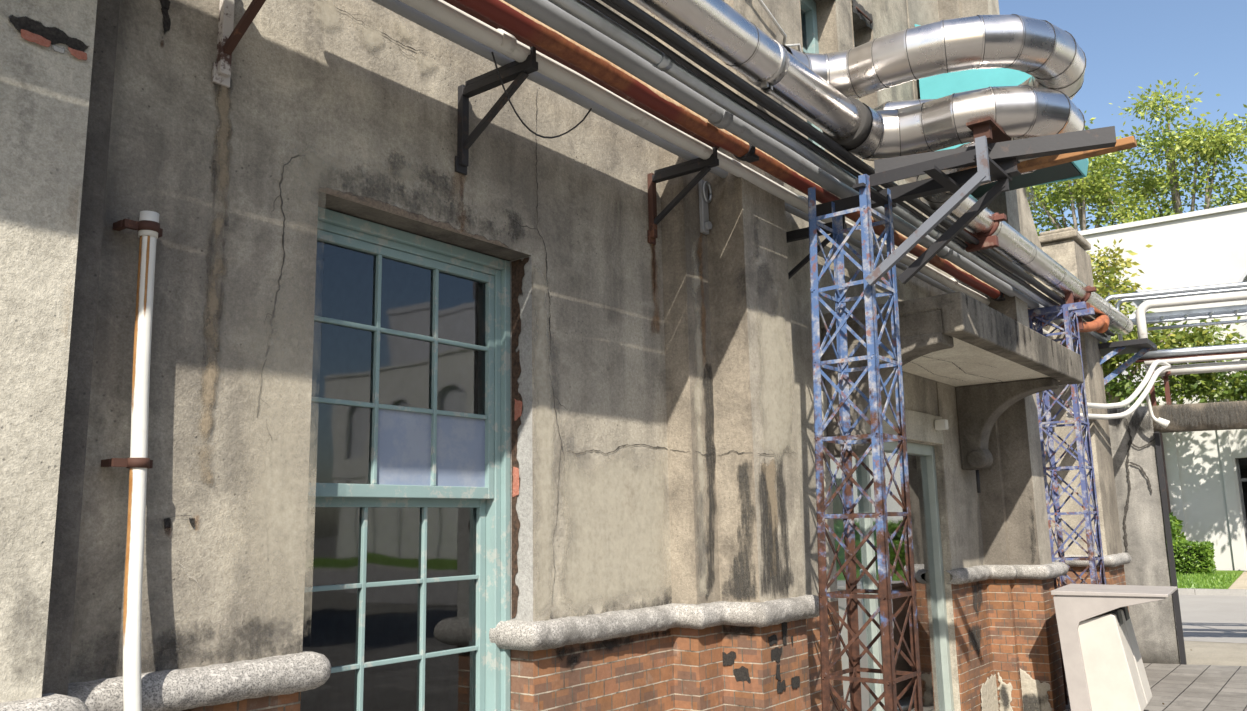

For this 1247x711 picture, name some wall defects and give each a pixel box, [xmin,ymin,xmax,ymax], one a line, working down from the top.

flaking render [9,15,89,60]
crack [257,155,307,467]
spalling [318,187,529,618]
crack [519,96,795,598]
damp [703,363,793,600]
peeling [981,669,1052,711]